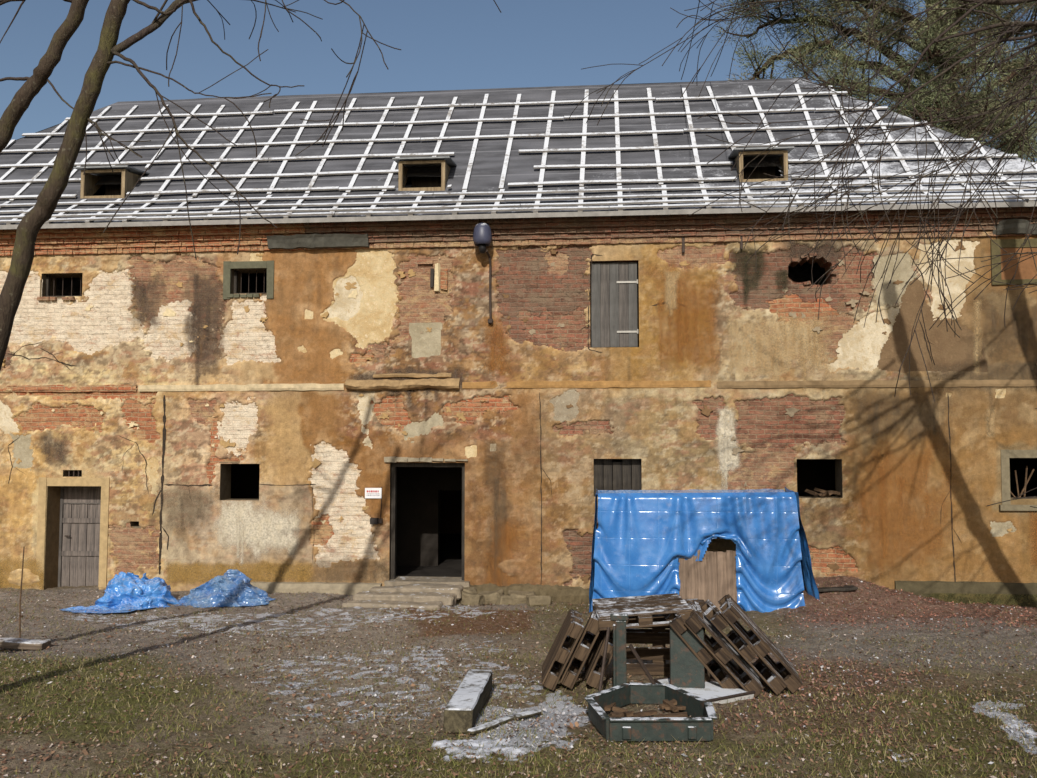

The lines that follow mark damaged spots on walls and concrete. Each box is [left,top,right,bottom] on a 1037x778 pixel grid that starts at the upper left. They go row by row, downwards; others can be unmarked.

spalling [0,253,281,371]
water stain [132,282,157,323]
water stain [185,277,222,380]
peeling [250,251,263,261]
peeling [304,249,455,367]
spalling [657,238,980,372]
spalling [187,397,259,485]
peeling [550,389,614,437]
spalling [693,394,847,490]
spalling [308,441,380,568]
spalling [563,524,599,586]